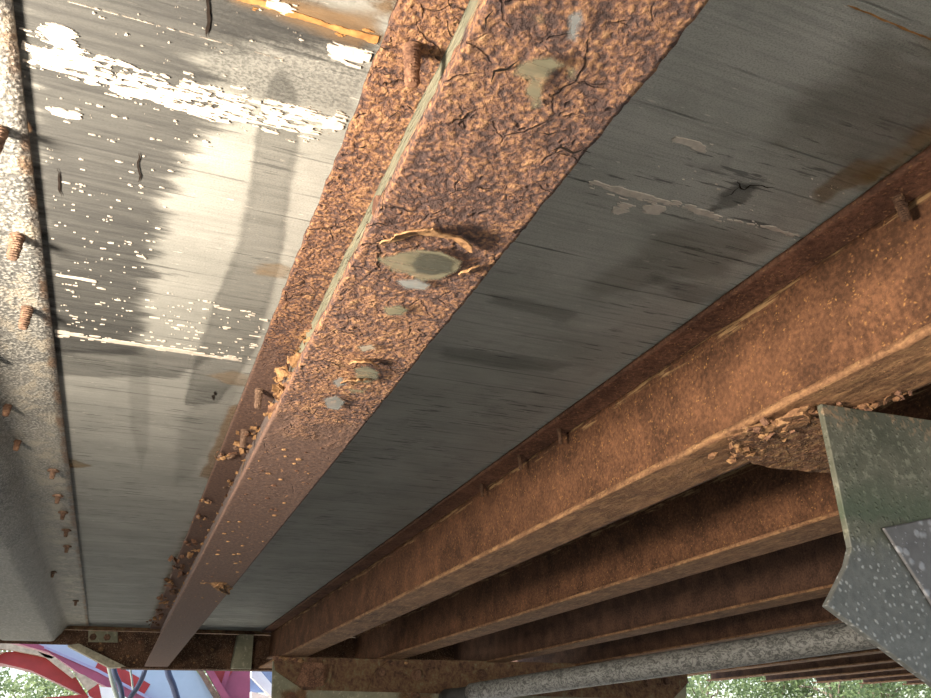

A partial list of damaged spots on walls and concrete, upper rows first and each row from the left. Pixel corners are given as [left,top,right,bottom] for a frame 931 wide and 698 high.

peeling [68,0,233,53]
peeling [259,0,298,17]
rust [238,0,379,44]
peeling [327,41,373,69]
peeling [588,180,800,241]
peeling [54,221,161,273]
rust [379,228,473,253]
spalling [413,254,452,275]
peeling [55,259,268,362]
rust [780,408,811,422]
rust [201,537,249,602]